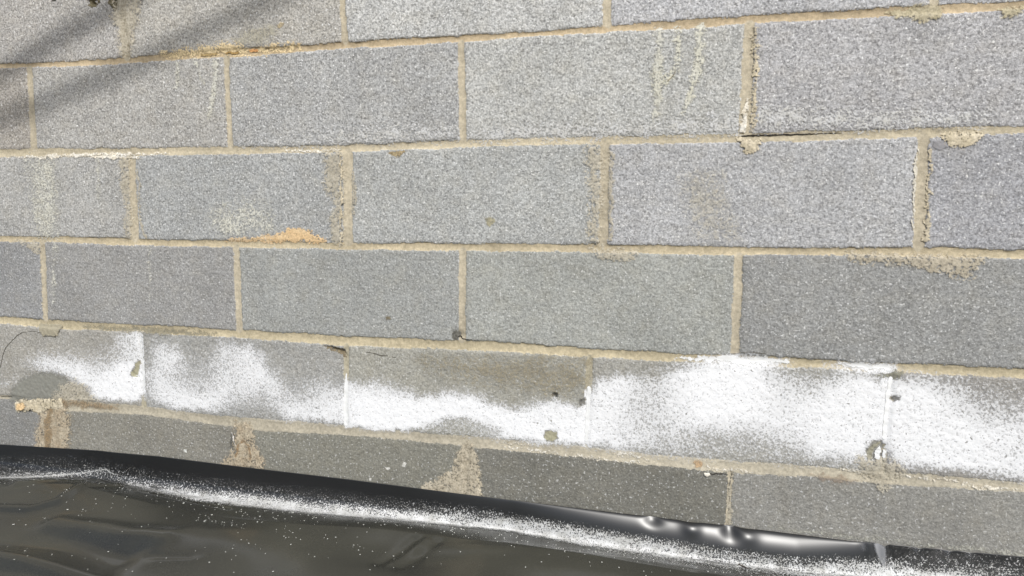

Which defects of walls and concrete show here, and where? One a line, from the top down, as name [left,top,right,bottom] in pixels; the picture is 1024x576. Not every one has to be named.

crack [713,127,833,137]
leakage [503,441,648,464]
leakage [901,474,1022,492]